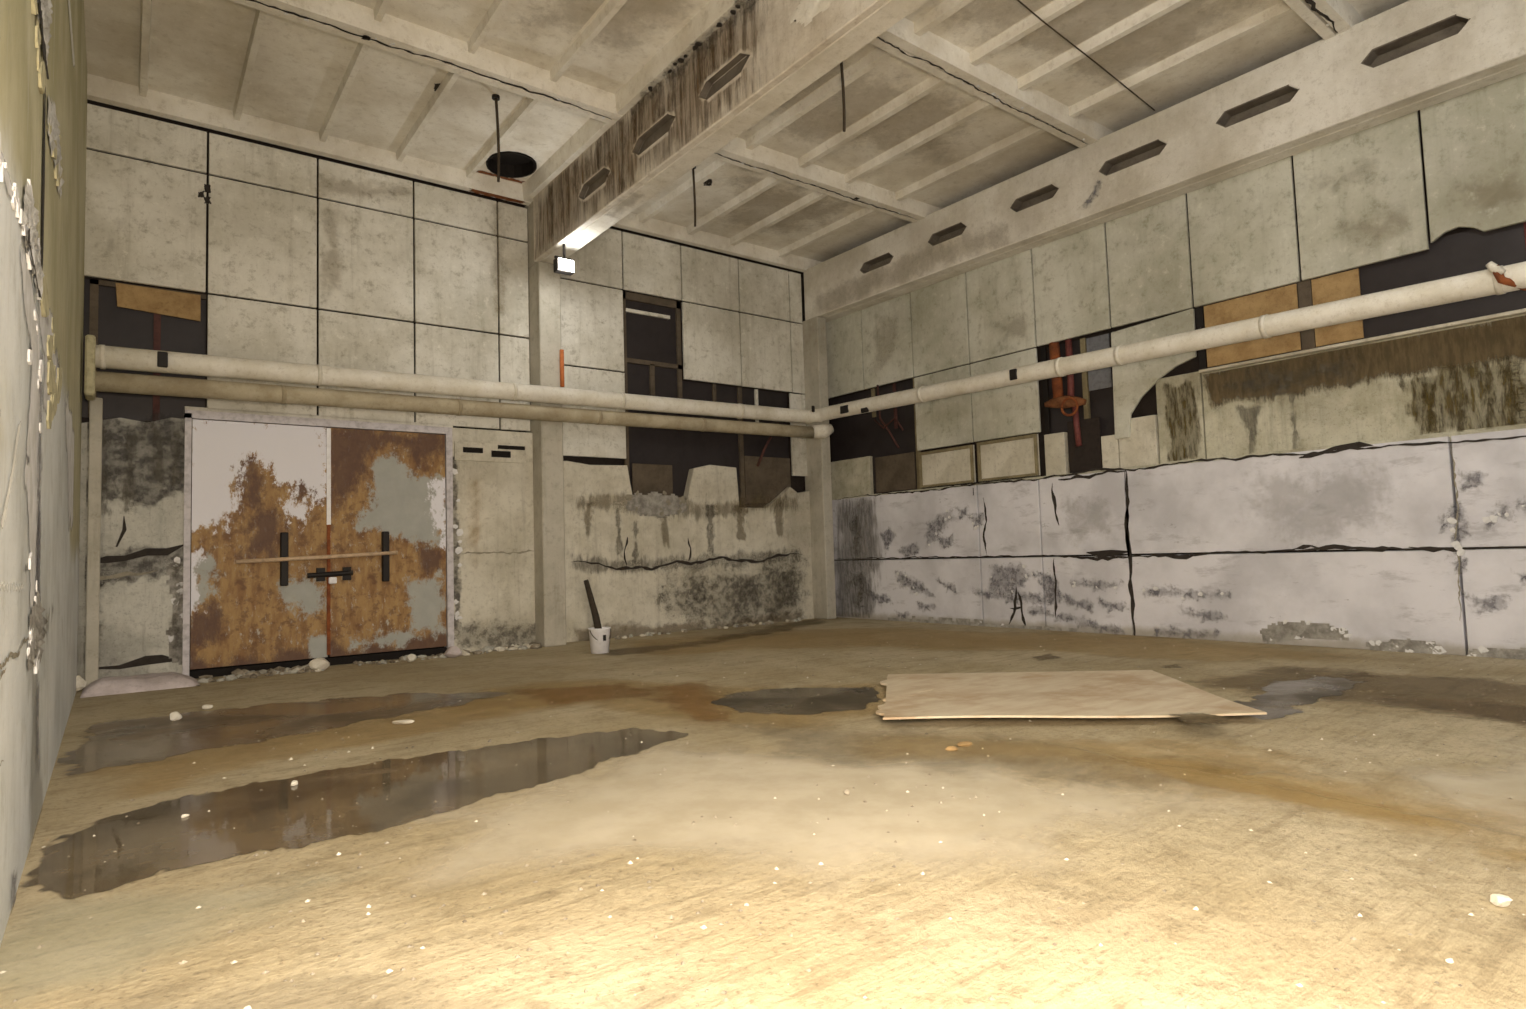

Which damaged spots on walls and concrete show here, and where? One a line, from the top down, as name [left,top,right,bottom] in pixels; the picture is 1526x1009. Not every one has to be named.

crack [1305,0,1338,33]
flaking render [31,0,65,198]
peeling [0,132,74,674]
leakage [1203,315,1526,446]
leakage [86,414,185,509]
spalling [625,491,688,518]
crack [573,537,802,573]
leakage [659,557,802,625]
leakage [834,498,882,618]
crack [835,436,1526,636]
crack [0,624,63,680]